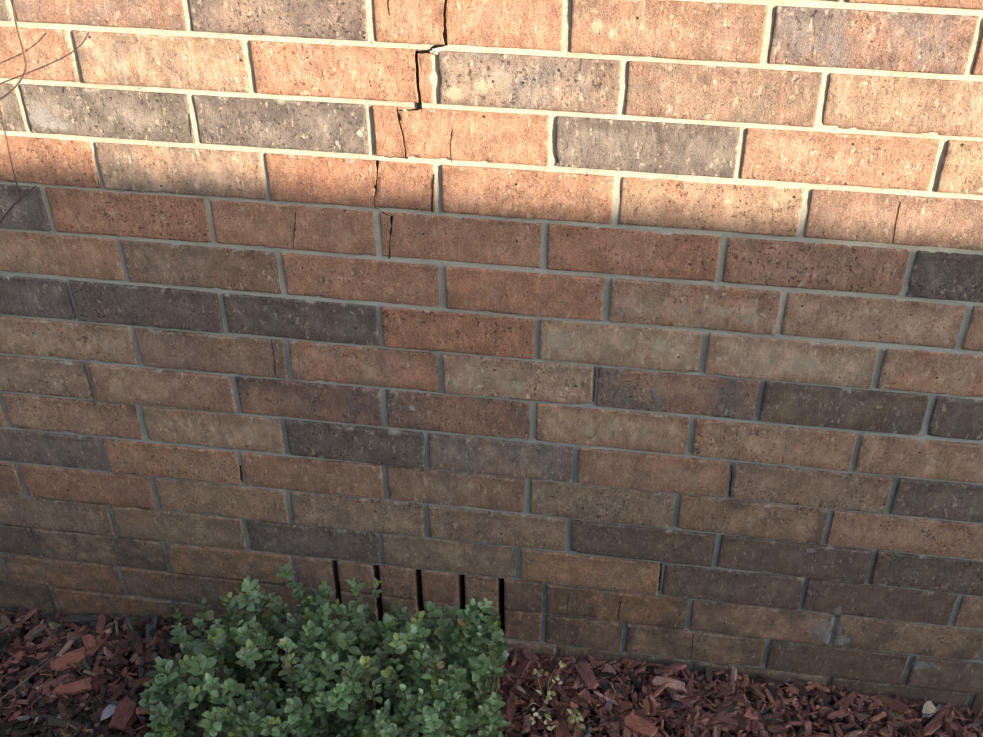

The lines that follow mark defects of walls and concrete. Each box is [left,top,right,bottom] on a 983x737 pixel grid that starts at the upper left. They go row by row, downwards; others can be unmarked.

crack [374,0,448,259]